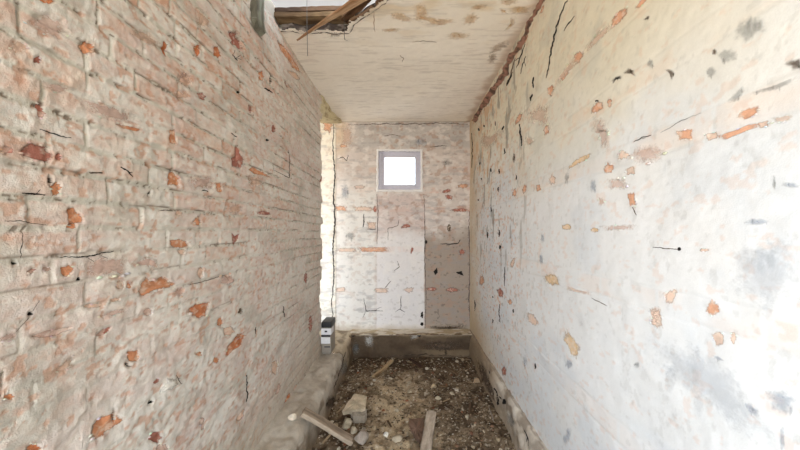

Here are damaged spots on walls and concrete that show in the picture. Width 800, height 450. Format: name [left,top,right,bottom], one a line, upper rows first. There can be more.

spalling [472,0,545,123]
crack [506,0,574,101]
spalling [676,129,692,141]
spalling [704,107,786,140]
spalling [0,141,62,163]
crack [331,122,522,323]
crack [60,251,113,261]
spalling [84,255,183,318]
spalling [189,302,210,318]
spalling [213,318,246,364]
spalling [564,332,580,356]
spalling [88,414,122,441]